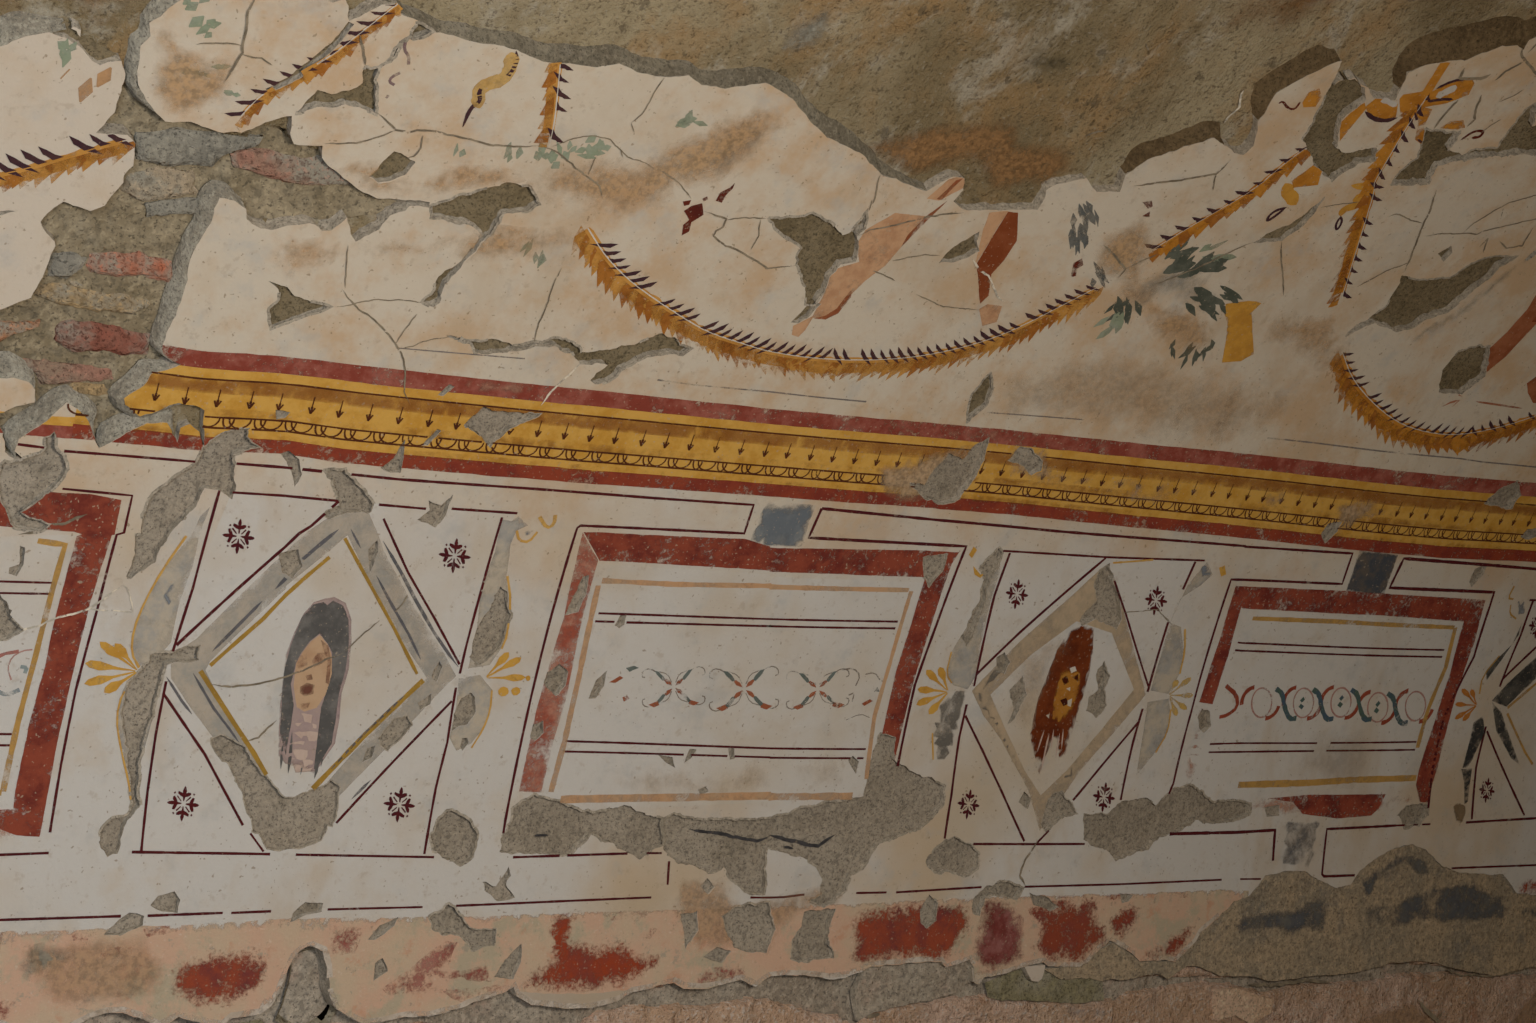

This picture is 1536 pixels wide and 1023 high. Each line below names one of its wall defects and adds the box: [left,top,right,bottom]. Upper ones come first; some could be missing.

crack [197,0,272,84]
crack [359,36,367,65]
crack [327,77,795,269]
flaking render [1301,73,1378,176]
flaking render [1390,102,1536,186]
flaking render [0,84,411,435]
crack [339,249,447,404]
crack [534,268,562,341]
flaking render [767,209,869,320]
crack [863,175,1003,310]
flaking render [1346,255,1518,337]
peeling [210,732,1536,1023]